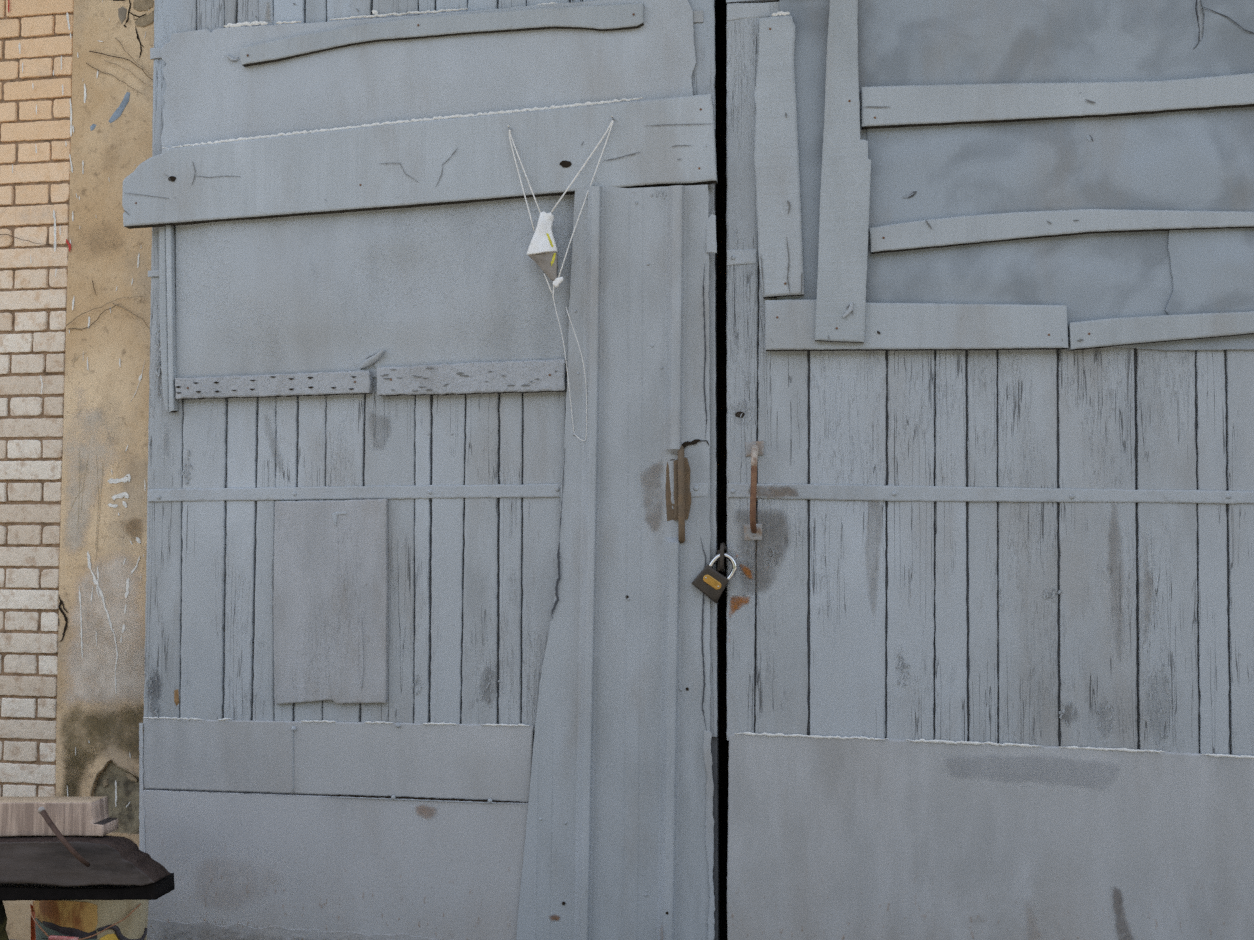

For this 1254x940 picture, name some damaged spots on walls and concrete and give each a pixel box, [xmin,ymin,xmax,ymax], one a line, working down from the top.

crack [113,0,146,58]
spalling [90,759,140,834]